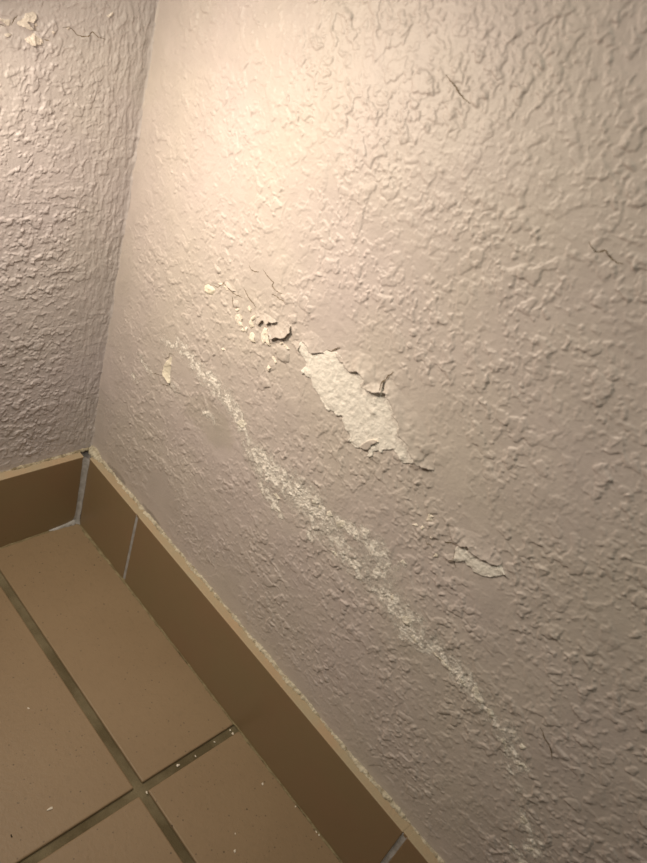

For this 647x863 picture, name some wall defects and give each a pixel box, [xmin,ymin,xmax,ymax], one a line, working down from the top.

peeling [0,11,104,46]
peeling [204,264,435,471]
spalling [88,445,445,863]
damp [163,337,530,794]
peeling [445,524,505,577]